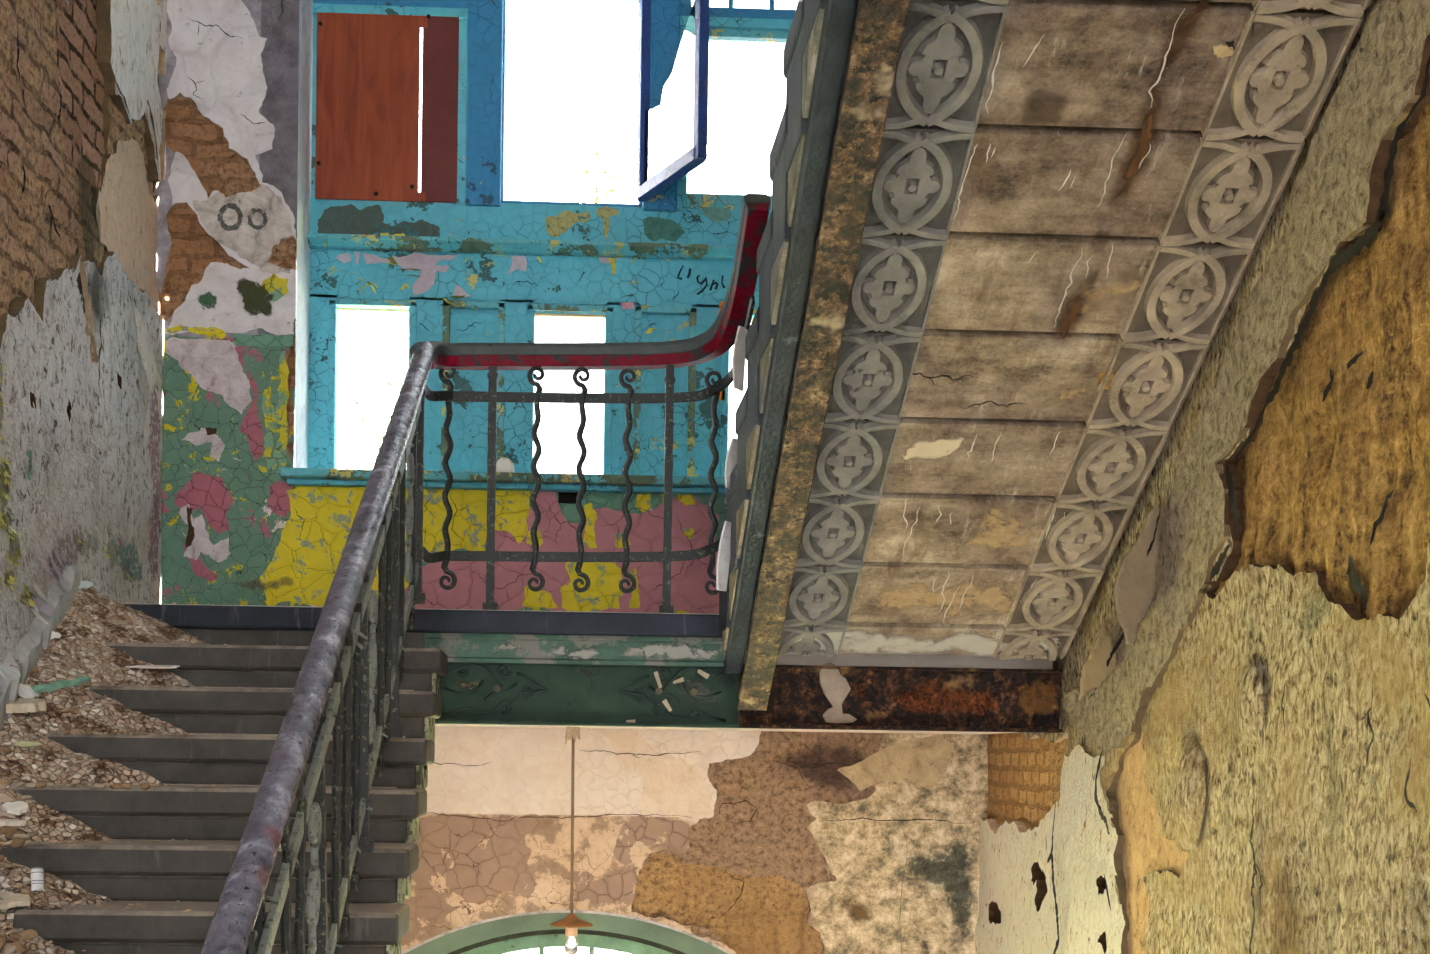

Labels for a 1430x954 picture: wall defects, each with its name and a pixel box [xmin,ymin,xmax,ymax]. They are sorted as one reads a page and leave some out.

spalling [0,0,365,607]
peeling [317,204,479,310]
spalling [974,34,1430,954]
peeling [392,488,724,614]
spalling [574,720,885,954]
leakage [787,747,863,790]
leakage [843,897,872,921]
mould [908,841,975,937]
crack [1047,803,1059,954]
crack [1094,748,1110,834]
crack [1361,687,1374,772]
crack [1404,758,1418,813]